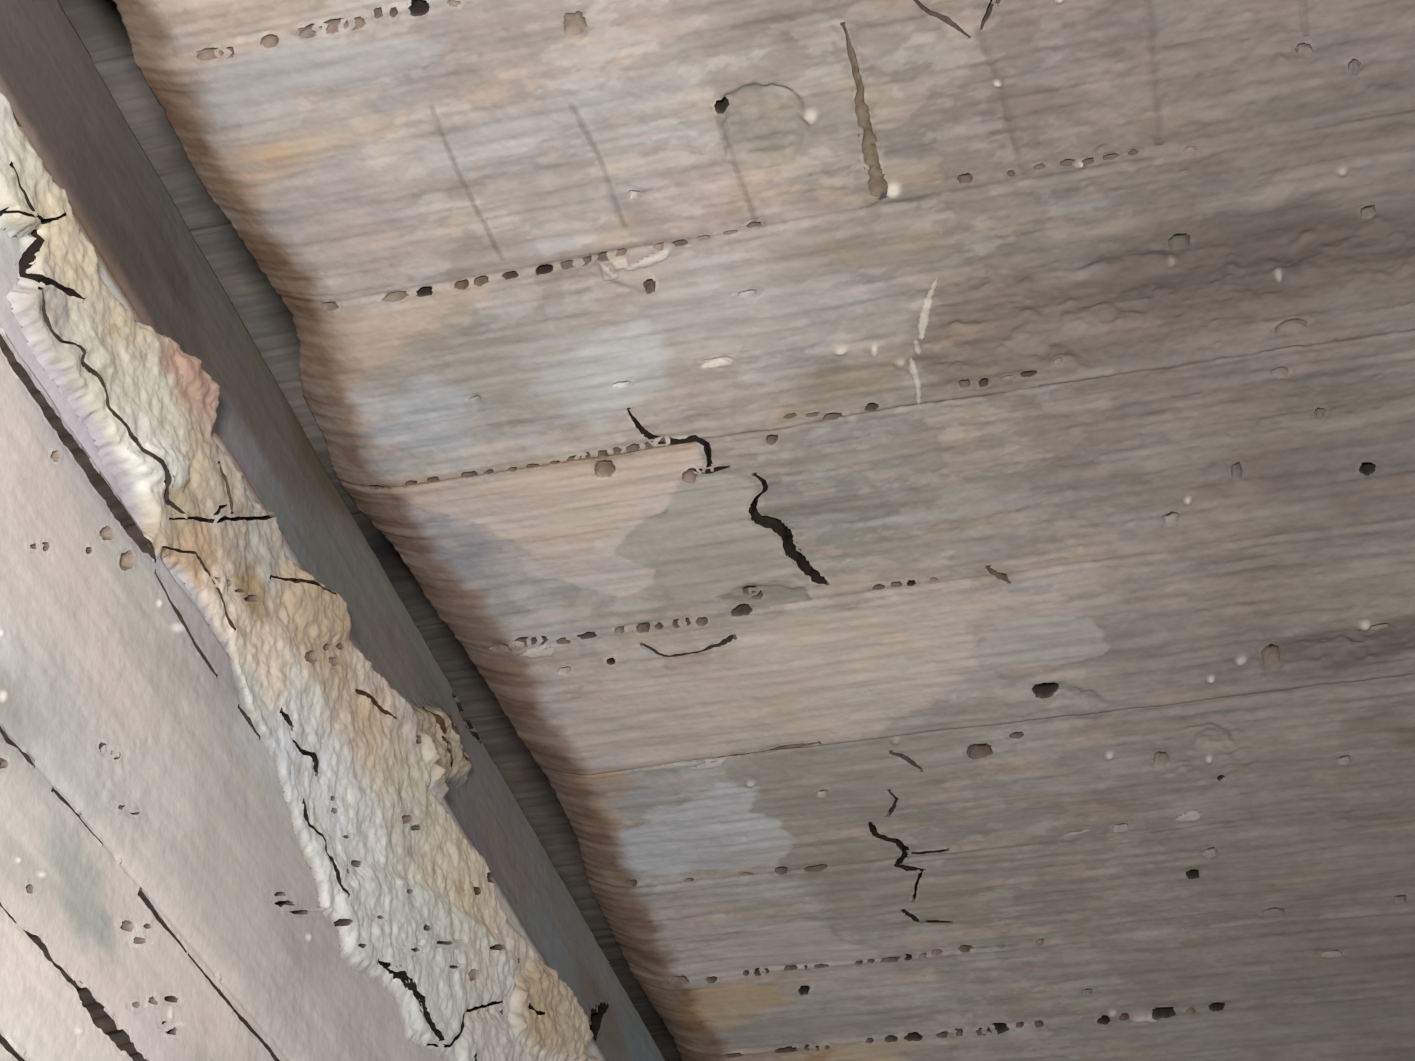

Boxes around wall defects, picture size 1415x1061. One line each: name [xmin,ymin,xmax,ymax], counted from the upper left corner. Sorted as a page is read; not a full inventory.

spalling [373,218,767,306]
crack [0,162,277,633]
flaking render [0,92,609,1061]
peeling [361,436,704,598]
crack [642,632,734,660]
spalling [691,353,741,371]
crack [624,408,830,586]
peeling [481,574,1072,771]
spalling [763,399,883,448]
crack [279,708,351,897]
crack [866,750,952,924]
crack [377,957,544,1061]